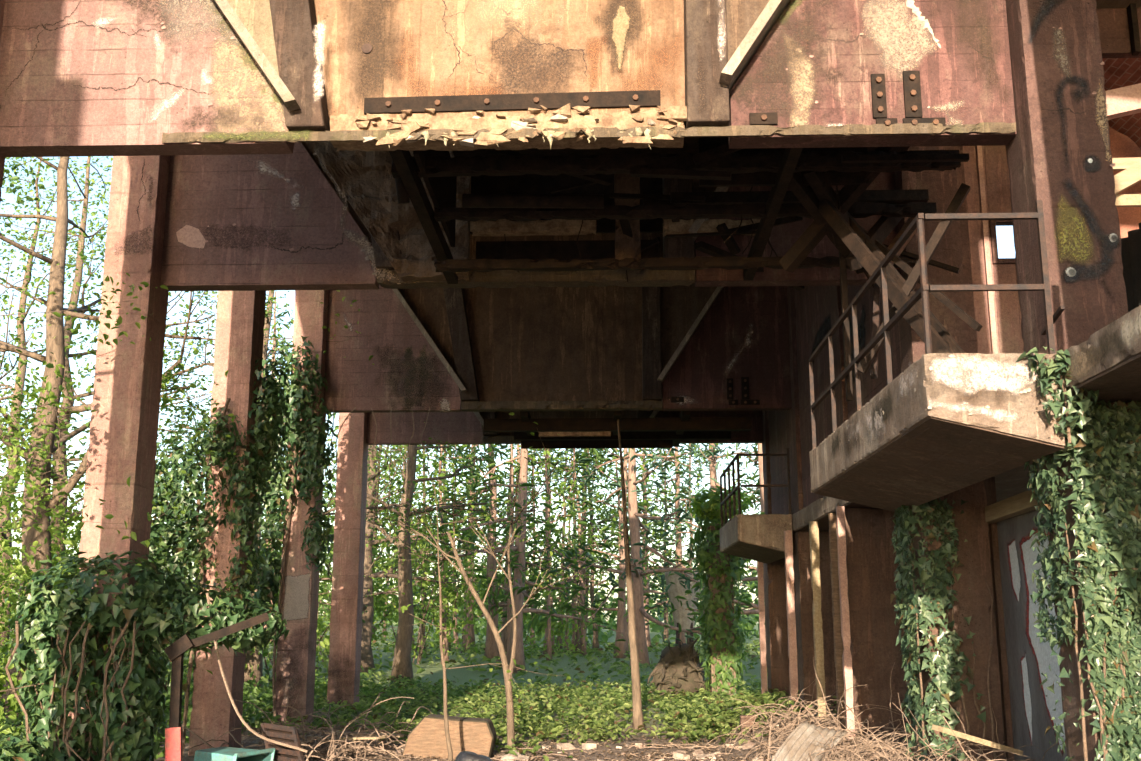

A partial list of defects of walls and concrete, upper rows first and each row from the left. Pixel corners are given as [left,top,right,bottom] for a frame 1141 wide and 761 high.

crack [5,1,269,96]
damp [123,0,182,42]
damp [352,0,401,99]
crack [442,0,587,78]
damp [491,0,576,94]
damp [589,0,641,87]
peeling [860,0,941,73]
spalling [618,105,687,149]
spalling [313,103,599,284]
peeling [900,355,1038,420]